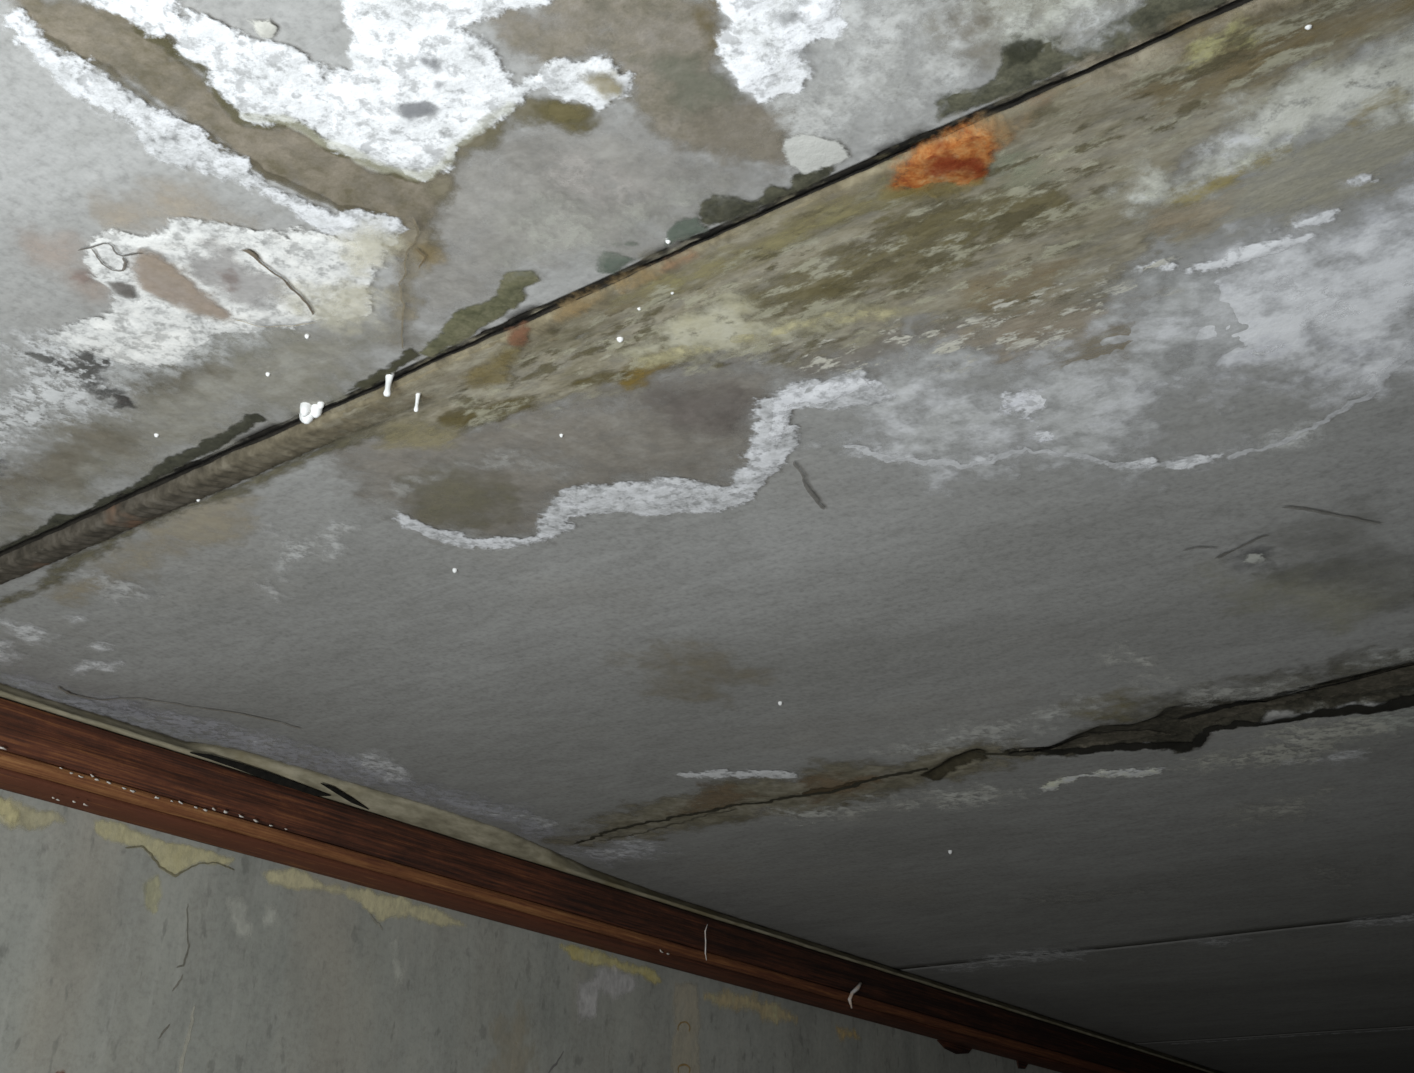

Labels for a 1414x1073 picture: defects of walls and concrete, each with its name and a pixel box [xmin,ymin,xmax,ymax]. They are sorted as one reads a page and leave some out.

spalling [253,20,277,38]
corrosion [890,122,1010,197]
crack [0,0,1252,556]
water stain [0,0,1414,662]
crack [1183,507,1380,558]
water stain [75,642,123,672]
water stain [9,648,1414,865]
crack [574,661,1414,844]
peeling [0,797,88,830]
peeling [95,820,234,912]
peeling [266,868,461,930]